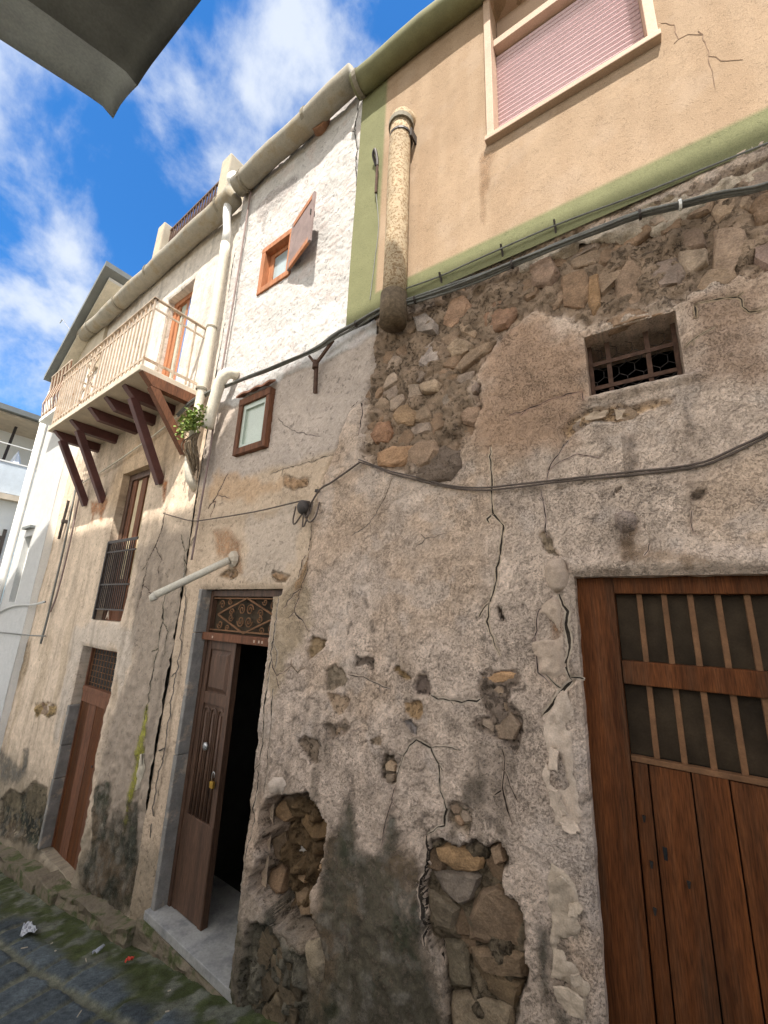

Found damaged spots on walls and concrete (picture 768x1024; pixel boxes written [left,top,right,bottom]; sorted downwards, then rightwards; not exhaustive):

spalling [358,155,768,478]
leakage [0,749,44,851]
leakage [81,782,138,911]
crack [137,514,194,857]
spalling [237,792,327,1024]
spalling [298,655,375,764]
leakage [314,806,439,1024]
crack [380,738,458,966]
spalling [422,801,530,1024]
crack [478,447,505,657]
flaking render [532,598,583,834]
crack [531,594,585,717]